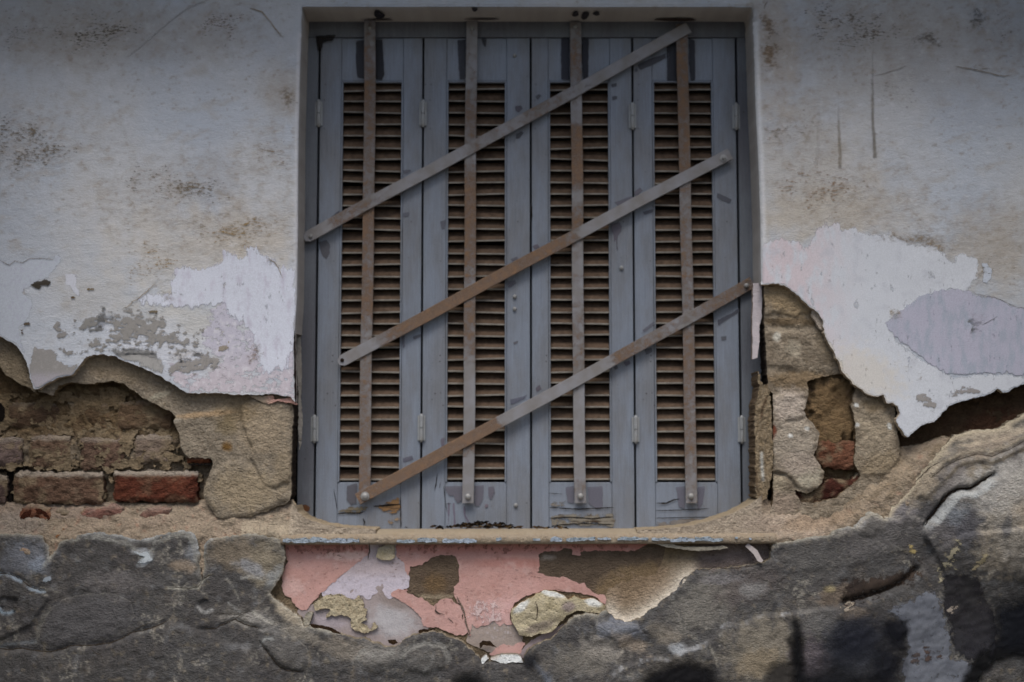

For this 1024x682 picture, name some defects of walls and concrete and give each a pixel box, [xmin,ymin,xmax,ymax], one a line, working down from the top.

flaking render [0,245,299,522]
peeling [747,223,1024,519]
peeling [283,537,477,646]
spalling [466,536,752,664]
crack [846,570,914,602]